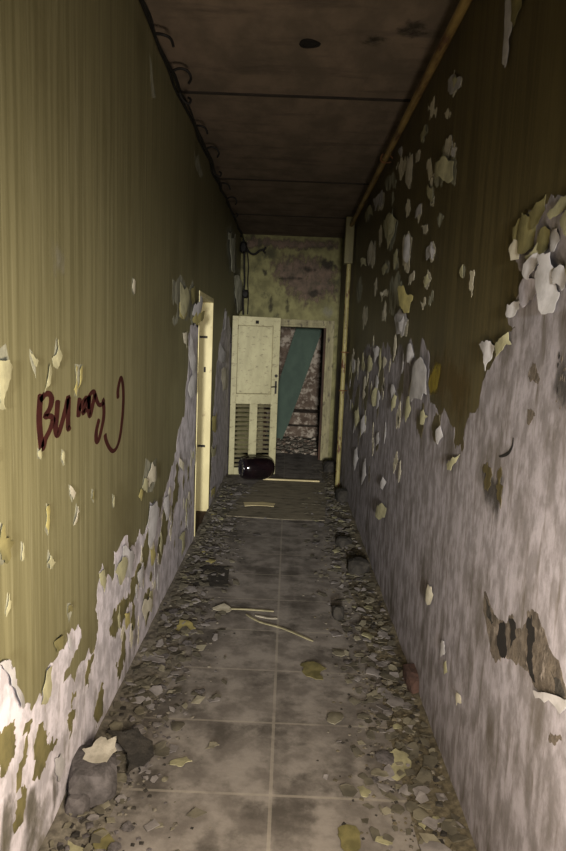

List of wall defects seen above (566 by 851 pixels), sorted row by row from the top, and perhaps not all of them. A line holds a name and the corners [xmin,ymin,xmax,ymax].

peeling [448,70,462,97]
peeling [0,274,205,851]
peeling [333,96,566,851]